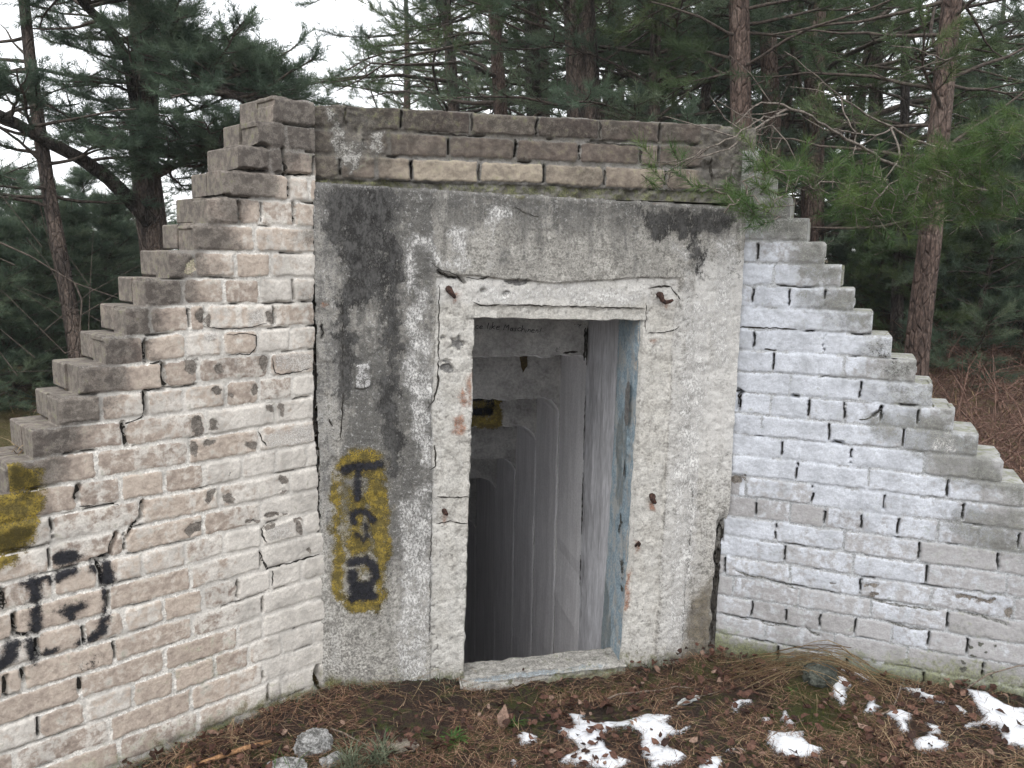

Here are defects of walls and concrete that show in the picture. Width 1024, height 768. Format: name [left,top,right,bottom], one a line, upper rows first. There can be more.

crack [73,484,142,579]
crack [120,343,166,445]
damp [321,185,470,478]
damp [374,489,434,681]
crack [429,445,468,640]
crack [428,262,680,408]
crack [579,400,587,580]
damp [635,203,737,655]
crack [682,474,820,640]